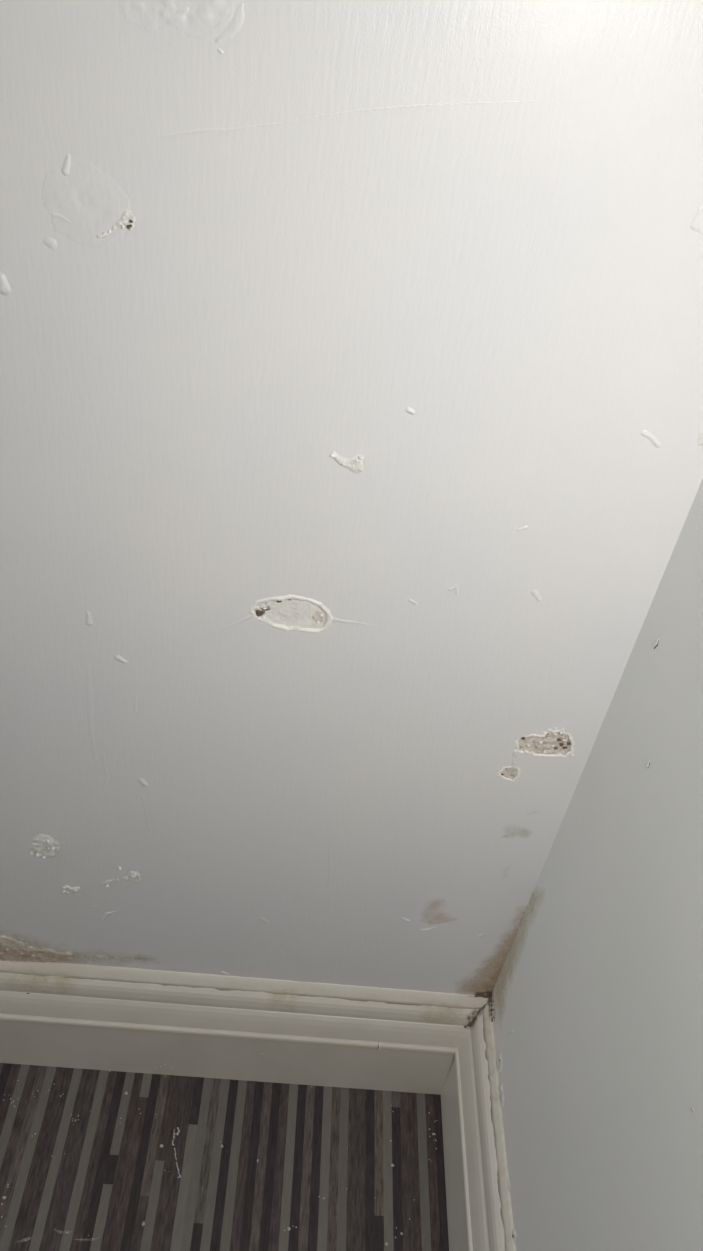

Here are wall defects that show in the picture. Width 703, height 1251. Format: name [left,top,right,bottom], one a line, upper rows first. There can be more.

spalling [249,595,333,633]
spalling [497,727,575,782]
spalling [0,934,74,963]
water stain [463,930,518,1028]